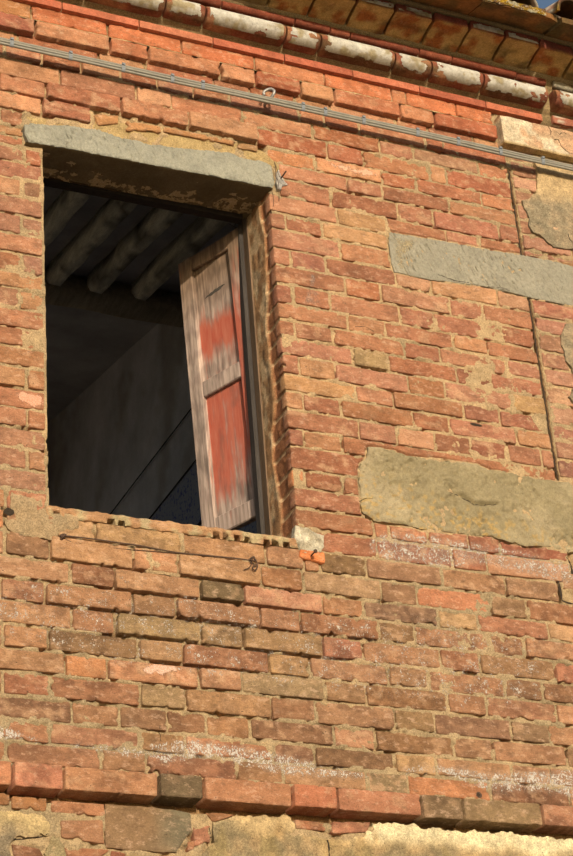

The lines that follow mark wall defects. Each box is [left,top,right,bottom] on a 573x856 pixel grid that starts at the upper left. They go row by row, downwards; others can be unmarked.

crack [507,170,524,255]
peeling [521,155,573,251]
crack [440,275,560,481]
crack [557,557,573,604]
damp [0,726,41,745]
damp [93,740,364,778]
damp [406,766,573,796]
peeling [0,811,50,856]